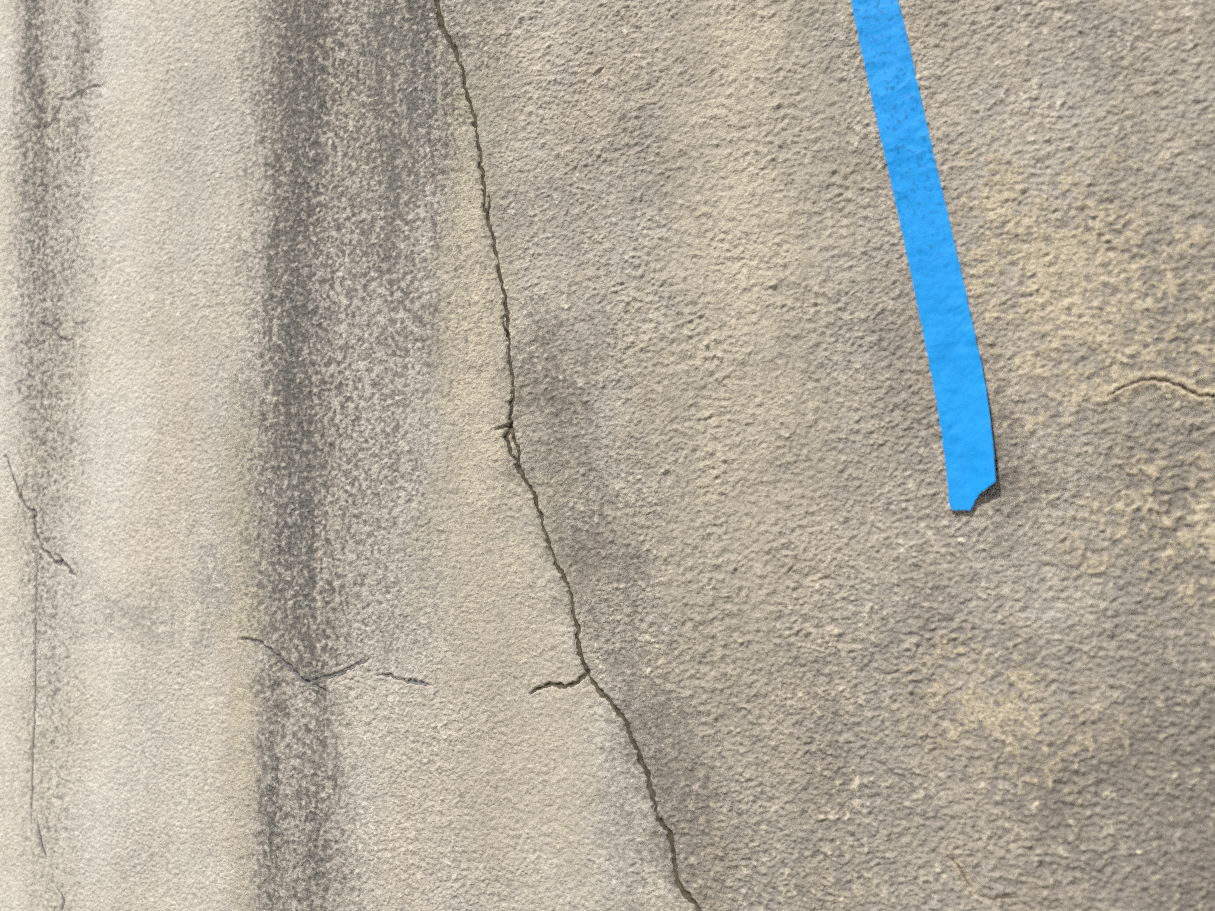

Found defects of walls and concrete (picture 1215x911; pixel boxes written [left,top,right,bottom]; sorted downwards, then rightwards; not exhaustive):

damp [21,0,78,302]
damp [216,0,598,911]
crack [434,0,701,911]
crack [1098,370,1215,408]
crack [6,456,75,857]
crack [241,638,429,691]